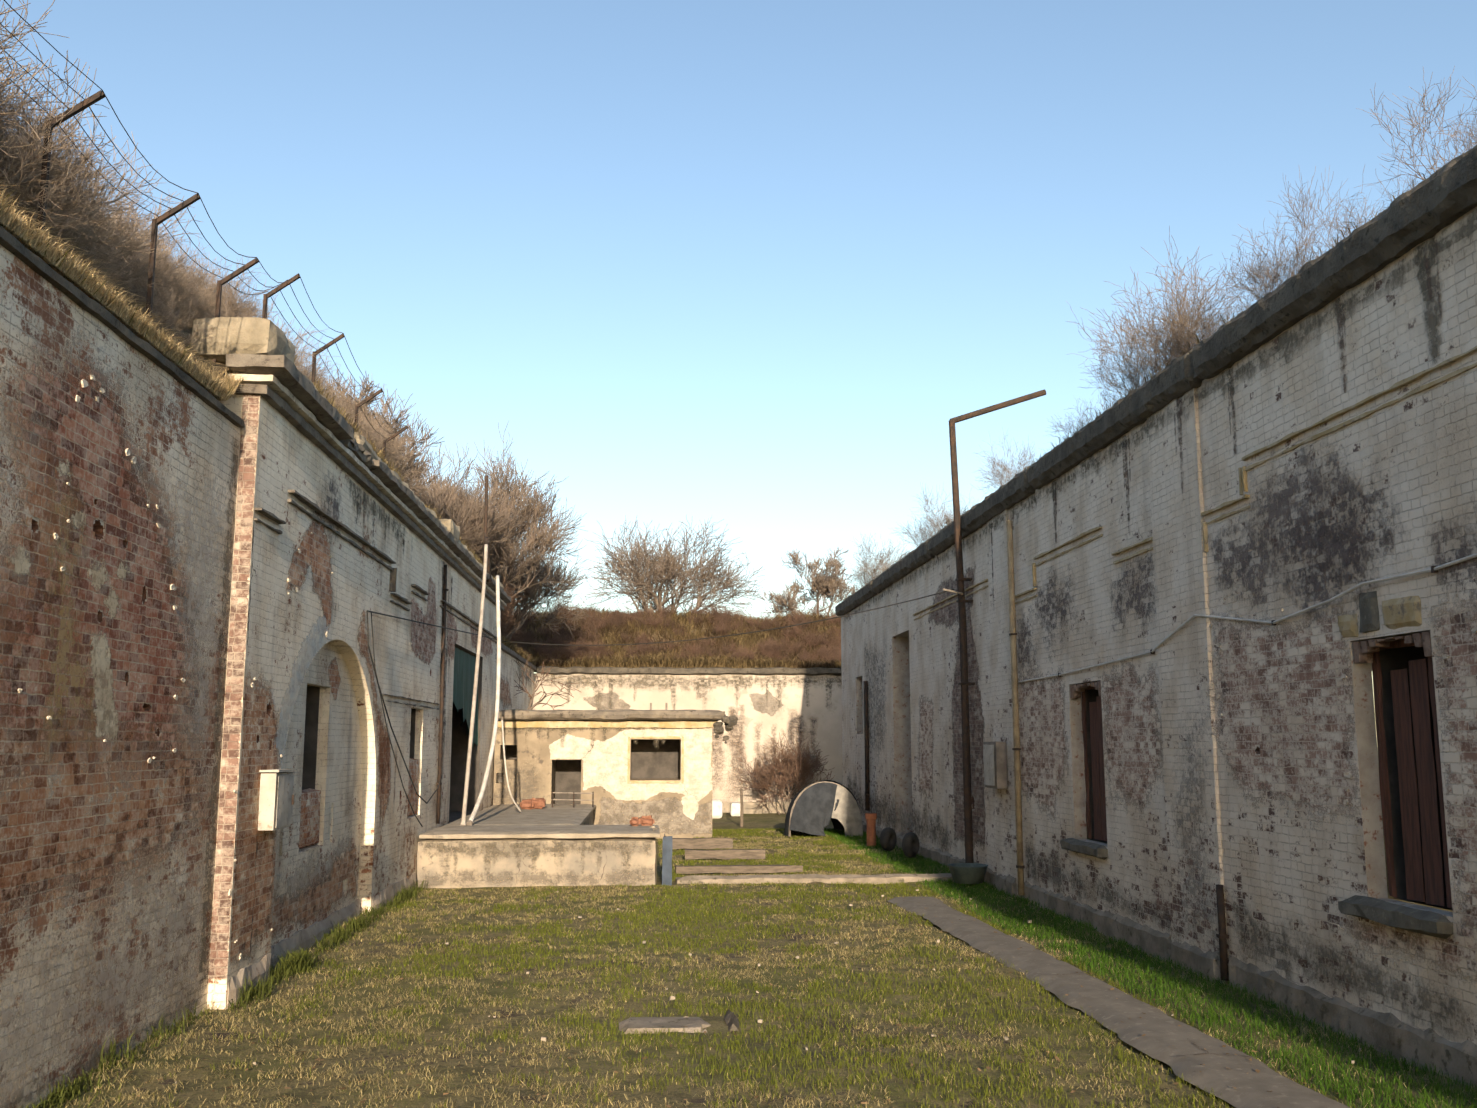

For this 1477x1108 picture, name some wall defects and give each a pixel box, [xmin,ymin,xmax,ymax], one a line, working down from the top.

water stain [846,211,1477,625]
peeling [0,322,358,979]
peeling [1101,661,1164,810]
peeling [1206,606,1360,826]
peeling [1341,598,1477,980]